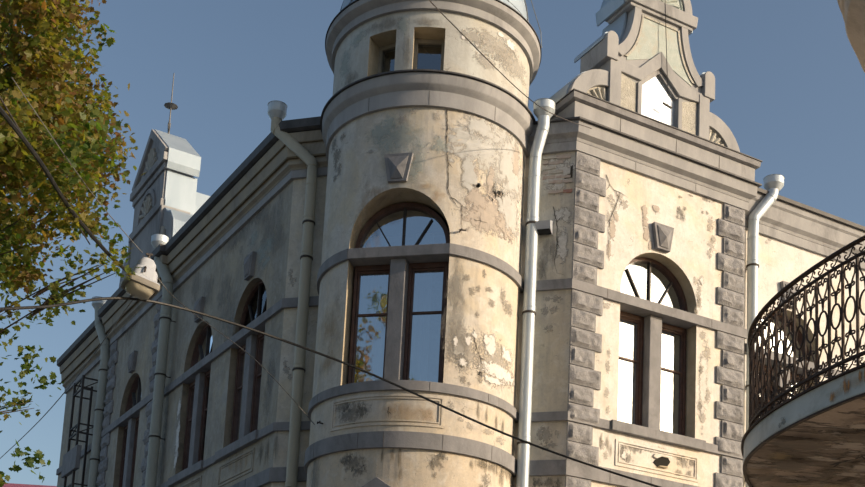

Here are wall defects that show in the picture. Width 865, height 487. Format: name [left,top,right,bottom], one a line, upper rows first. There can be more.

crack [446,110,487,233]
peeling [413,113,524,244]
flaking render [541,154,575,195]
crack [606,175,628,243]
peeling [453,331,516,390]